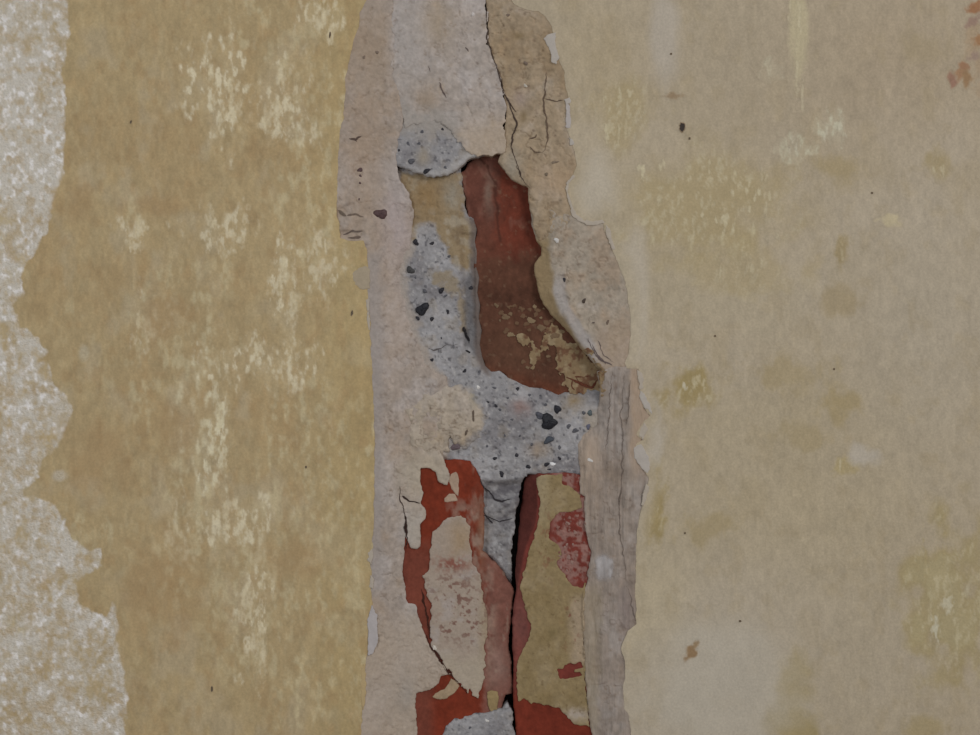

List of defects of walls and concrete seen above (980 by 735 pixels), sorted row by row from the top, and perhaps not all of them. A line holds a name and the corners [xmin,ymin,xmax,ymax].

crack [465,9,562,188]
spalling [337,0,490,735]
spalling [486,0,652,735]
crack [399,494,418,545]
crack [421,590,468,694]
rust [680,639,702,664]